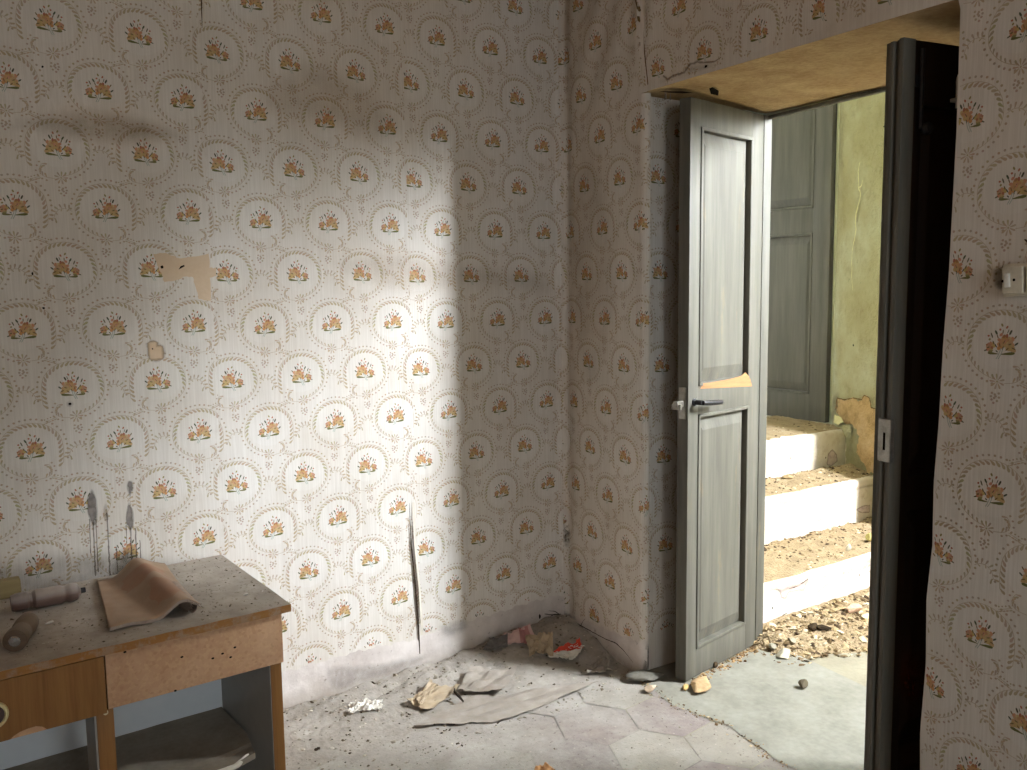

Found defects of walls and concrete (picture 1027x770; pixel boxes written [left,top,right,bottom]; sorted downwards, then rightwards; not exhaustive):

peeling [153,253,216,301]
peeling [148,341,164,360]
flaking render [834,395,875,474]